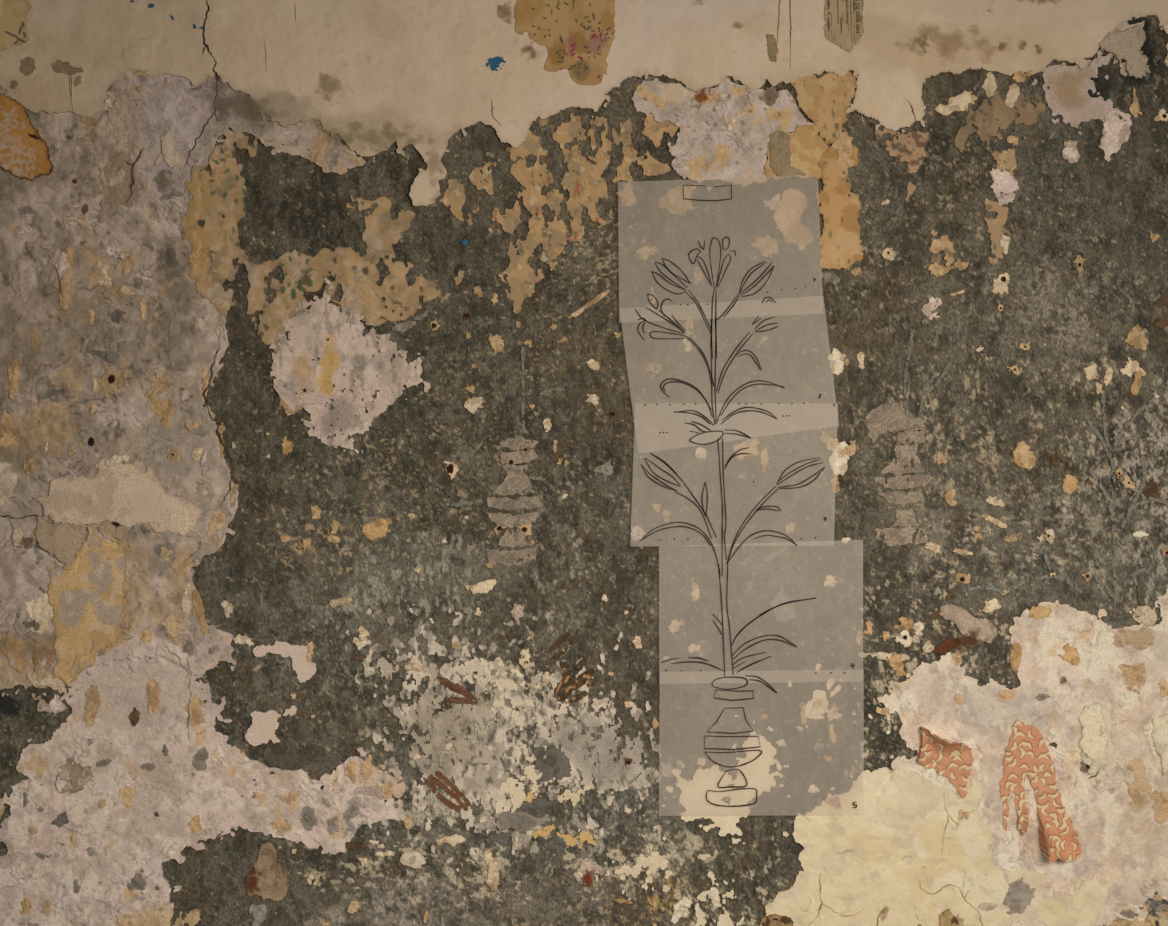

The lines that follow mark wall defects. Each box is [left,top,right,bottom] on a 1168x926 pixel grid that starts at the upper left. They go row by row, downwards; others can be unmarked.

crack [186,1,221,164]
peeling [439,78,815,328]
peeling [859,117,932,203]
peeling [984,168,1019,265]
flaking render [935,21,1151,163]
flaking render [827,348,865,376]
flaking render [1084,324,1149,394]
flaking render [0,69,610,926]
flaking render [829,441,849,477]
peeling [569,632,706,807]
flaking render [796,588,1168,926]
flaking render [574,791,682,900]